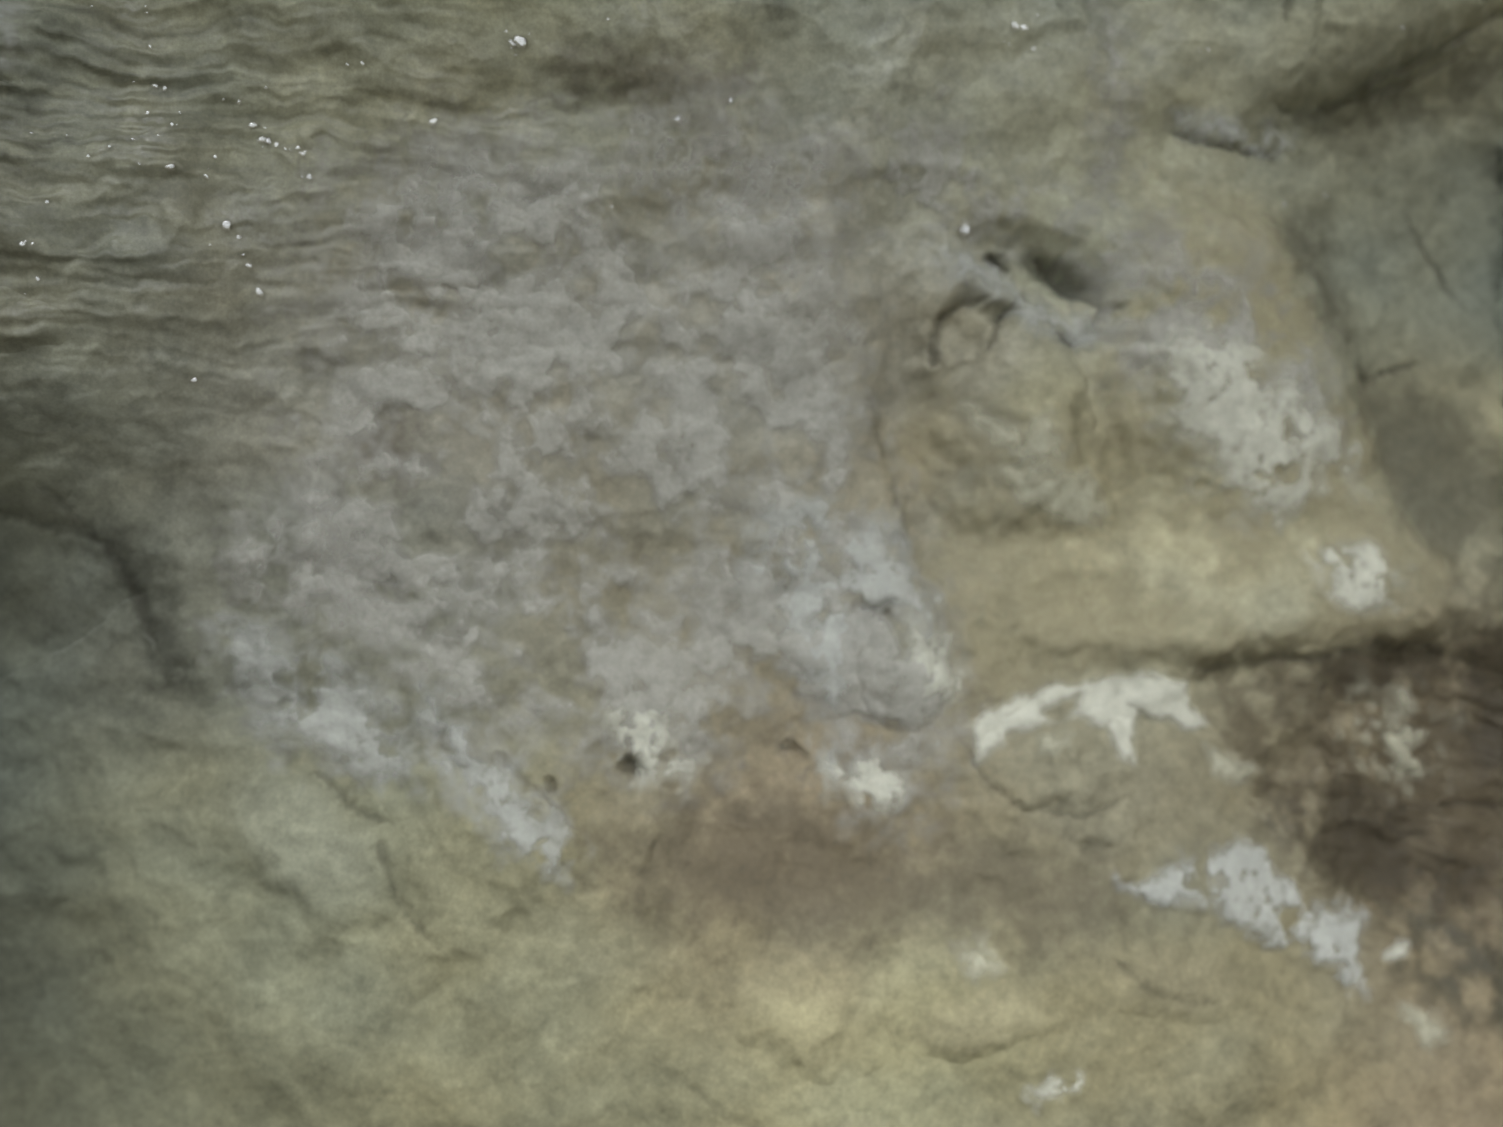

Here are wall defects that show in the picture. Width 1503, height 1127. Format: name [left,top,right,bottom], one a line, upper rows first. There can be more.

damp [886,131,998,217]
damp [959,255,1094,344]
damp [1121,242,1354,513]
damp [1324,543,1386,611]
damp [974,675,1204,760]
damp [1386,726,1421,773]
damp [1130,845,1361,984]
damp [1387,945,1406,957]